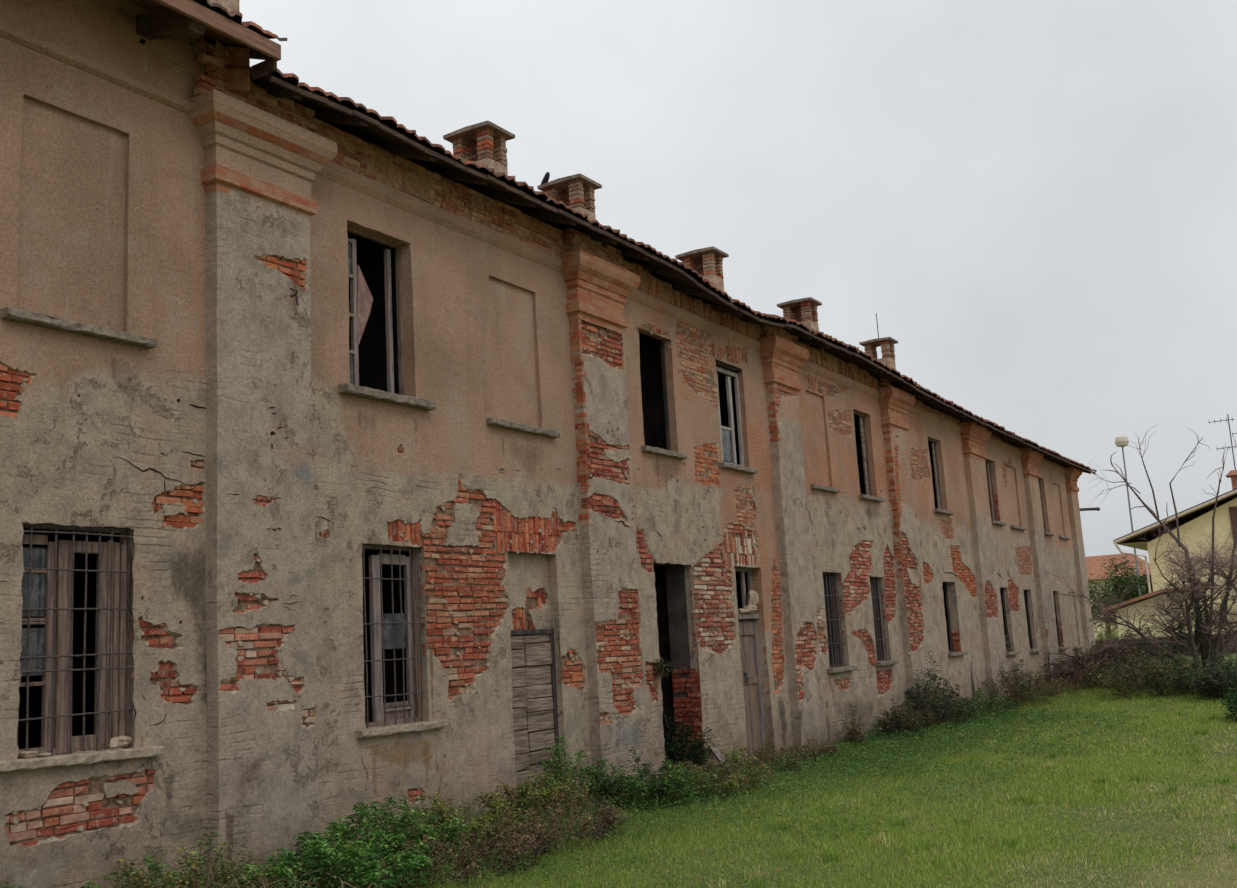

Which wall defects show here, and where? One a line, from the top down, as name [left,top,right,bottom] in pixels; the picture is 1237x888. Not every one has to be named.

spalling [254,254,308,294]
spalling [0,361,37,419]
crack [114,449,206,491]
spalling [152,459,205,530]
spalling [586,421,656,574]
spalling [129,616,202,705]
spalling [218,552,317,729]
spalling [387,473,578,701]
spalling [557,588,659,725]
spalling [659,442,828,702]
spalling [838,435,935,698]
spalling [4,768,158,847]